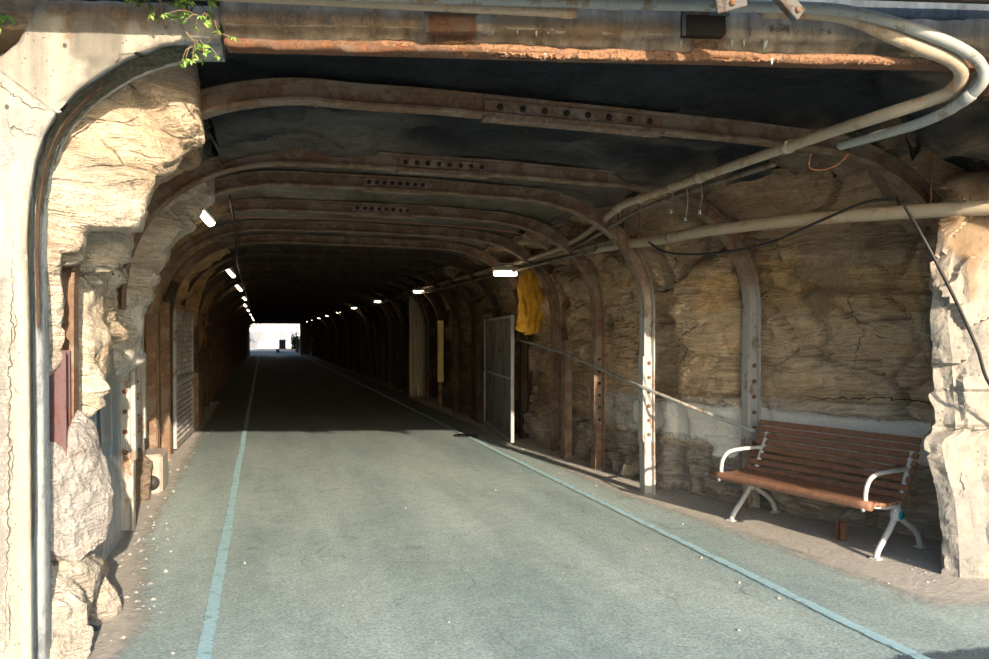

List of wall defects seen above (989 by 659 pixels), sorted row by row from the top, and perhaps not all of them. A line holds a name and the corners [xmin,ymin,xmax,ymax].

crack [847,279,890,372]
crack [0,239,20,649]
crack [781,392,932,404]